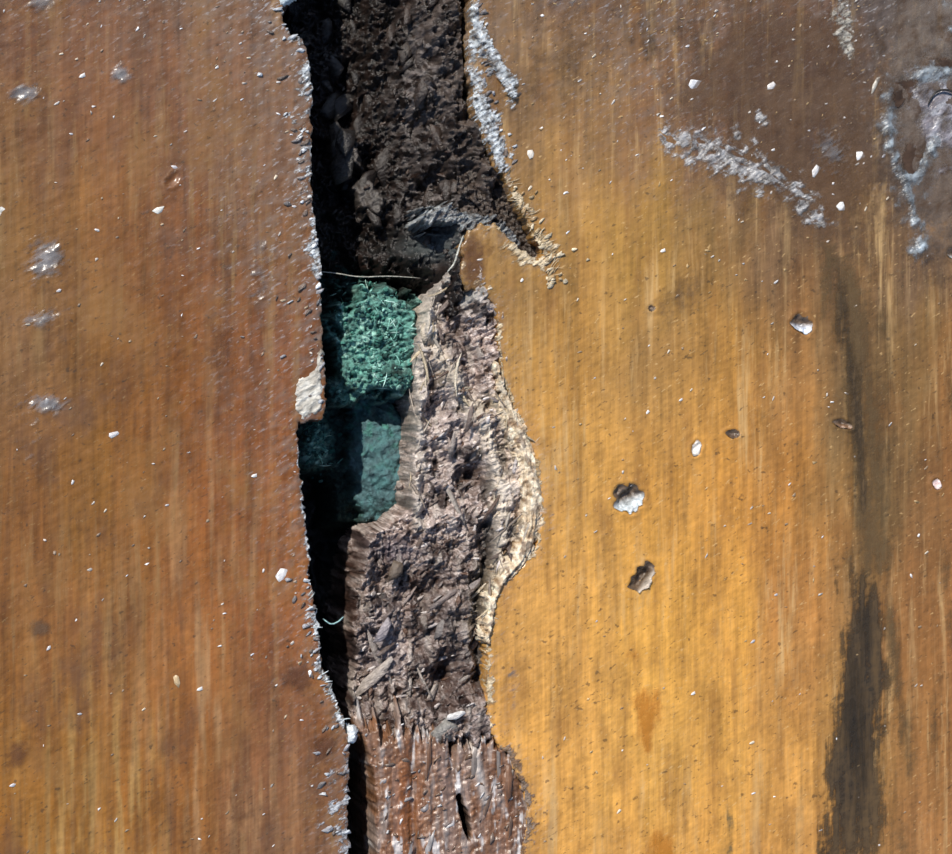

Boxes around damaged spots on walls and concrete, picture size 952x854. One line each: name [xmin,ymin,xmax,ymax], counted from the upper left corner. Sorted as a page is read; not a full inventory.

crack [282,5,290,28]
peeling [266,0,392,316]
crack [456,157,536,257]
crack [301,480,349,675]
spalling [285,267,544,854]
water stain [817,249,901,854]